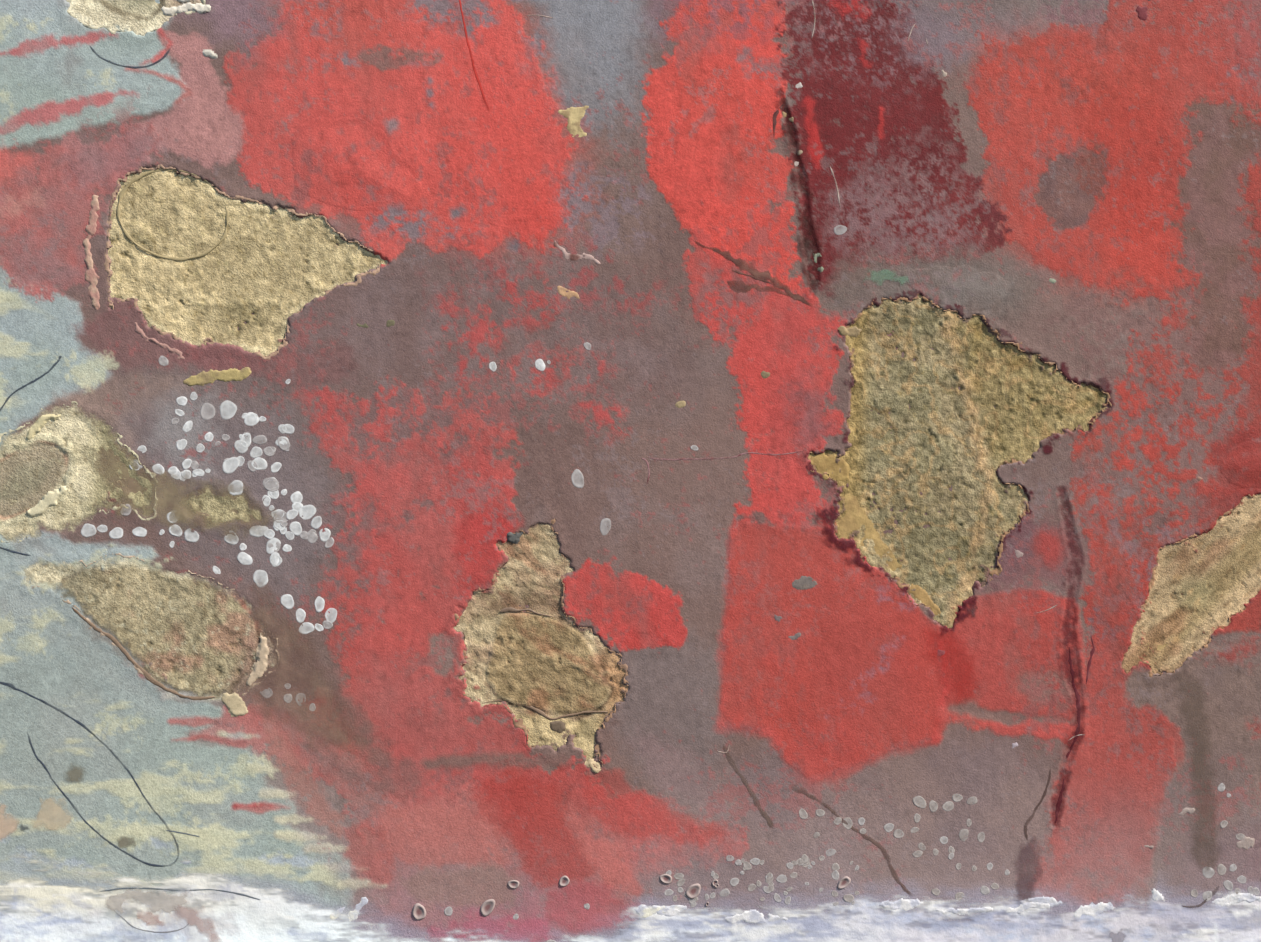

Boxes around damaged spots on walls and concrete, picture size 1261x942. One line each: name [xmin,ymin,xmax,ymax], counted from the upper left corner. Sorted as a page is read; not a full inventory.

spalling [66,0,211,36]
spalling [83,164,388,386]
spalling [0,401,158,543]
spalling [24,553,279,717]
spalling [187,488,262,523]
spalling [453,518,629,773]
peeling [792,576,817,590]
spalling [807,294,1112,628]
spalling [1121,493,1261,677]
crack [724,747,772,827]
crack [798,790,909,894]
crack [1024,636,1095,838]